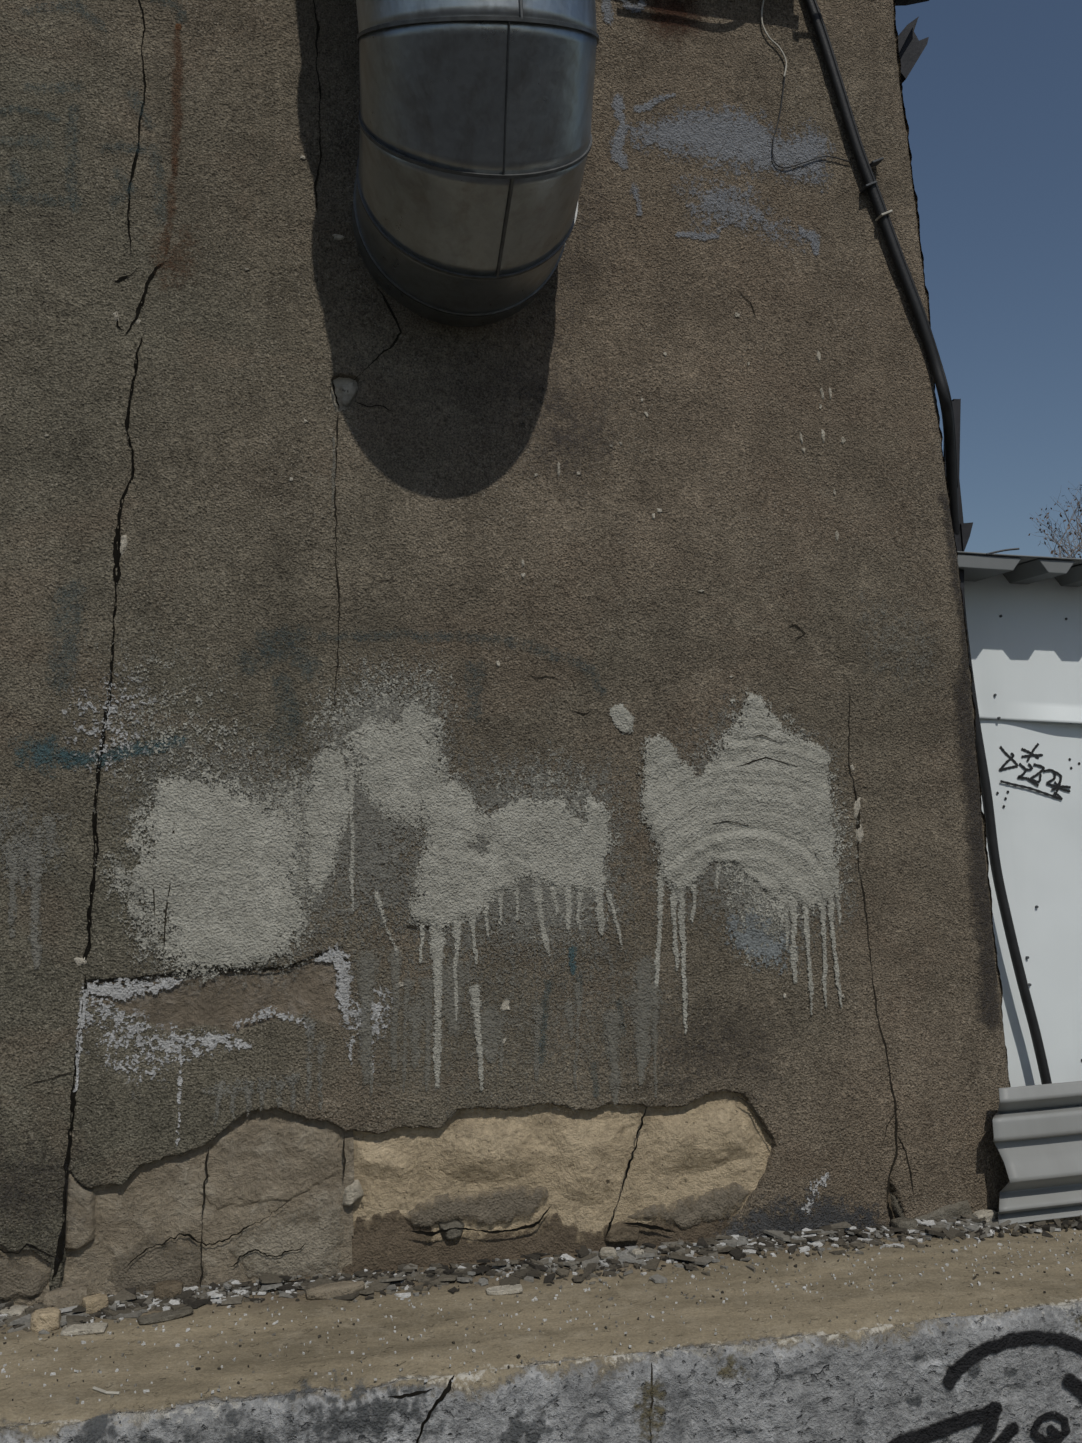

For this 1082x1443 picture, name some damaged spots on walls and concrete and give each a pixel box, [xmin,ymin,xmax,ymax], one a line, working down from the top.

crack [313,0,322,213]
spalling [330,377,391,412]
crack [355,287,402,379]
crack [25,0,166,1279]
crack [331,416,393,751]
leakage [175,1039,183,1146]
leakage [202,1011,326,1125]
spalling [0,1091,772,1306]
crack [848,700,914,1226]
crack [389,1375,454,1443]